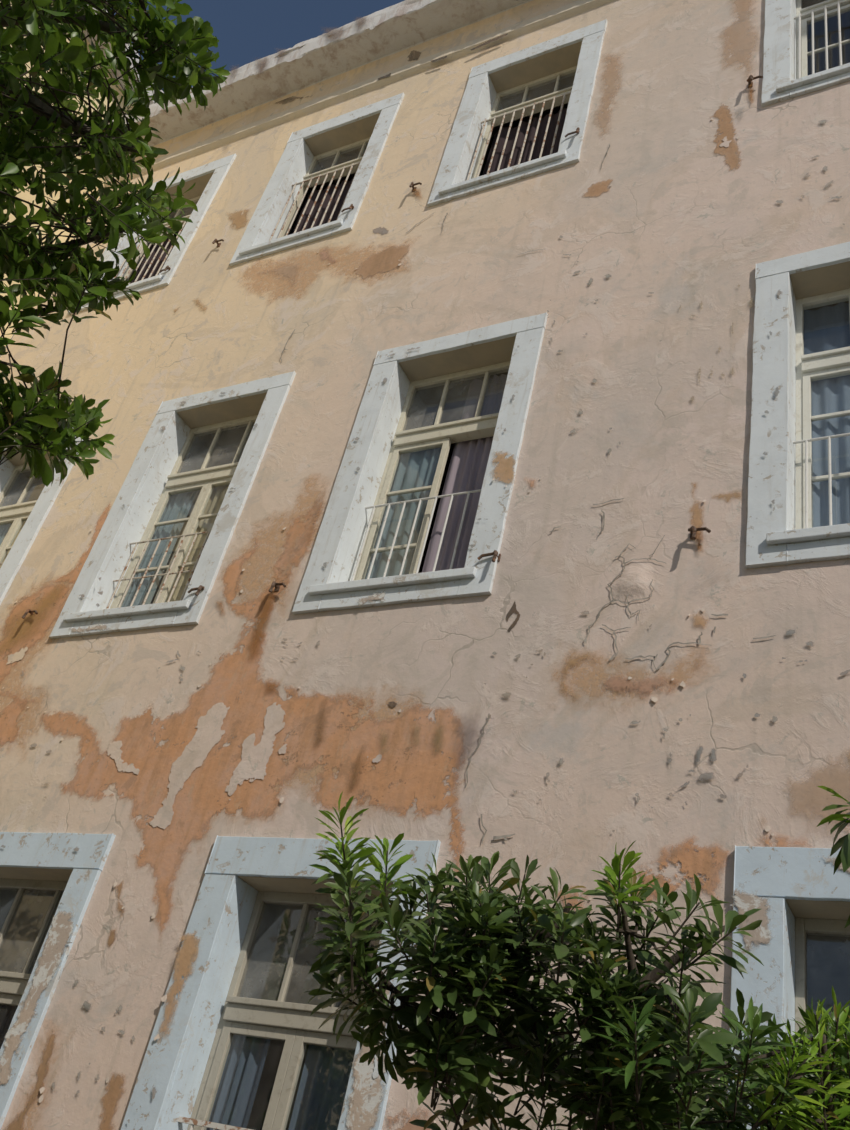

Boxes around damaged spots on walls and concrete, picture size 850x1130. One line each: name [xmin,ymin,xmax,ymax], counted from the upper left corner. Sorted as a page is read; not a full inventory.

peeling [724,0,754,65]
peeling [710,106,741,170]
peeling [243,245,409,299]
peeling [492,452,515,486]
crack [584,498,728,670]
peeling [0,479,464,930]
peeling [637,839,728,910]
peeling [730,889,771,950]
peeling [0,903,74,1085]
peeling [154,932,200,1041]
peeling [77,1063,133,1130]
peeling [346,1021,436,1130]